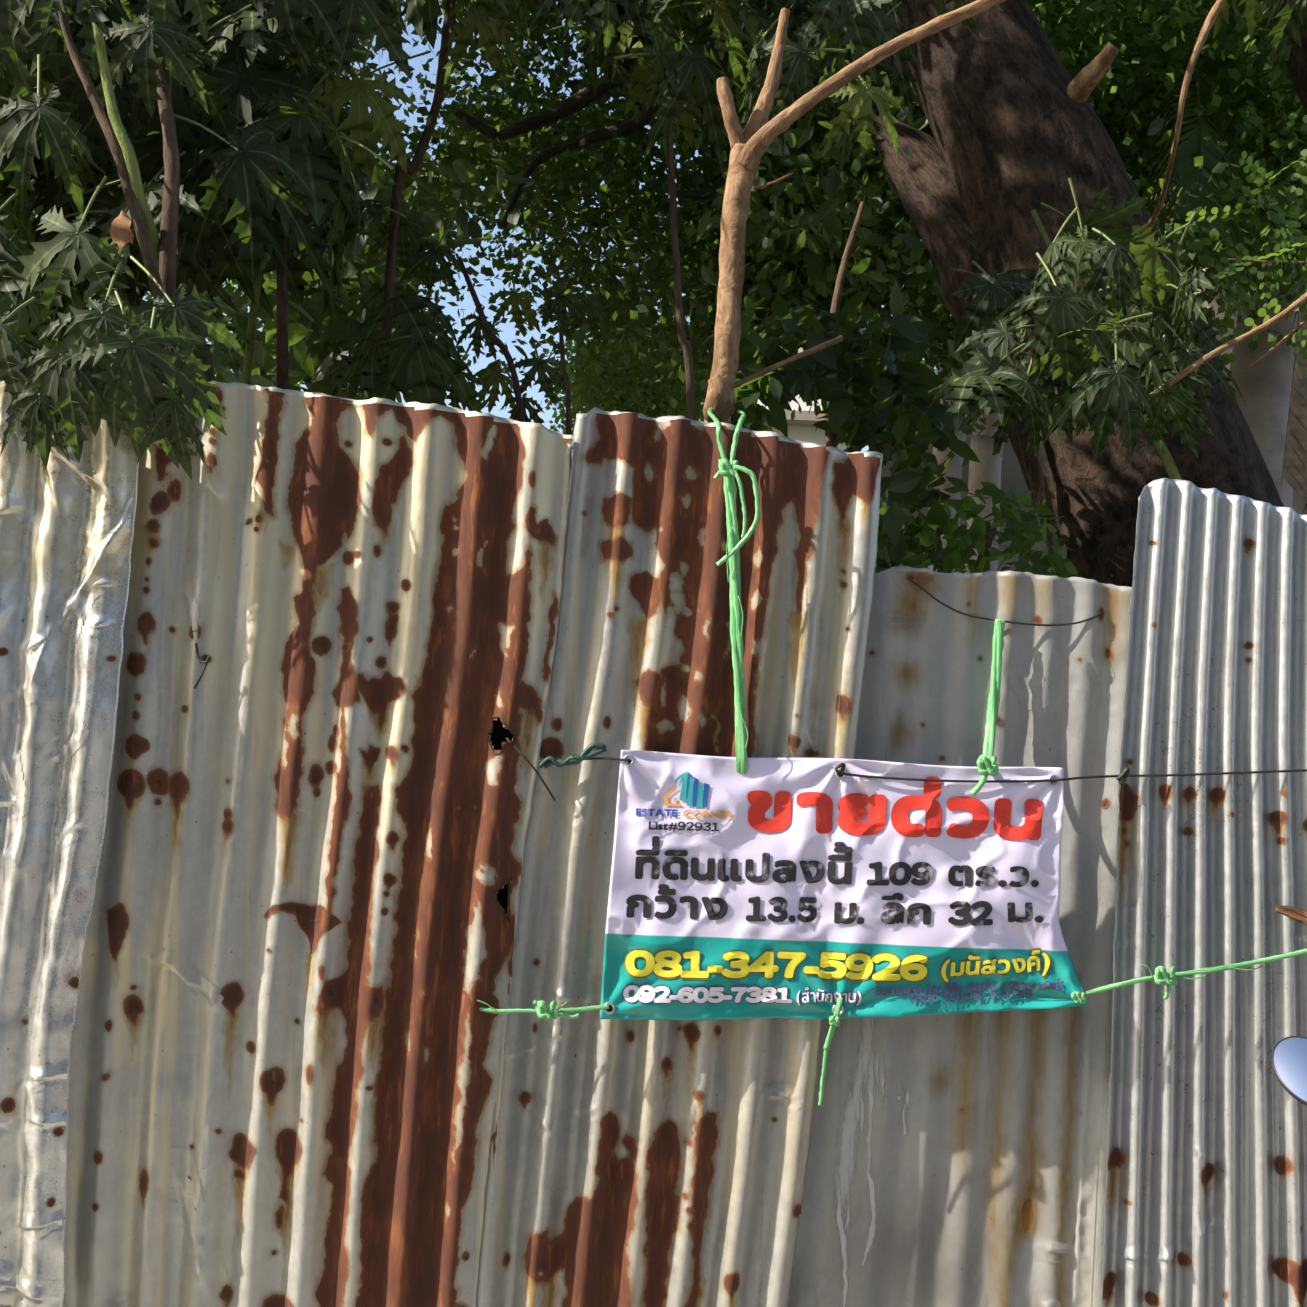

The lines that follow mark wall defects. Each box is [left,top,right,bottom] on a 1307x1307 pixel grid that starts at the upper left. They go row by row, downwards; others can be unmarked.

rust [143,444,181,594]
rust [583,412,881,758]
rust [107,611,202,676]
rust [117,693,189,850]
rust [245,388,564,1307]
rust [1101,783,1138,897]
rust [1159,784,1234,817]
rust [107,903,129,962]
rust [220,982,256,1059]
rust [216,1129,255,1223]
rust [503,1090,718,1307]
rust [1272,1257,1307,1307]